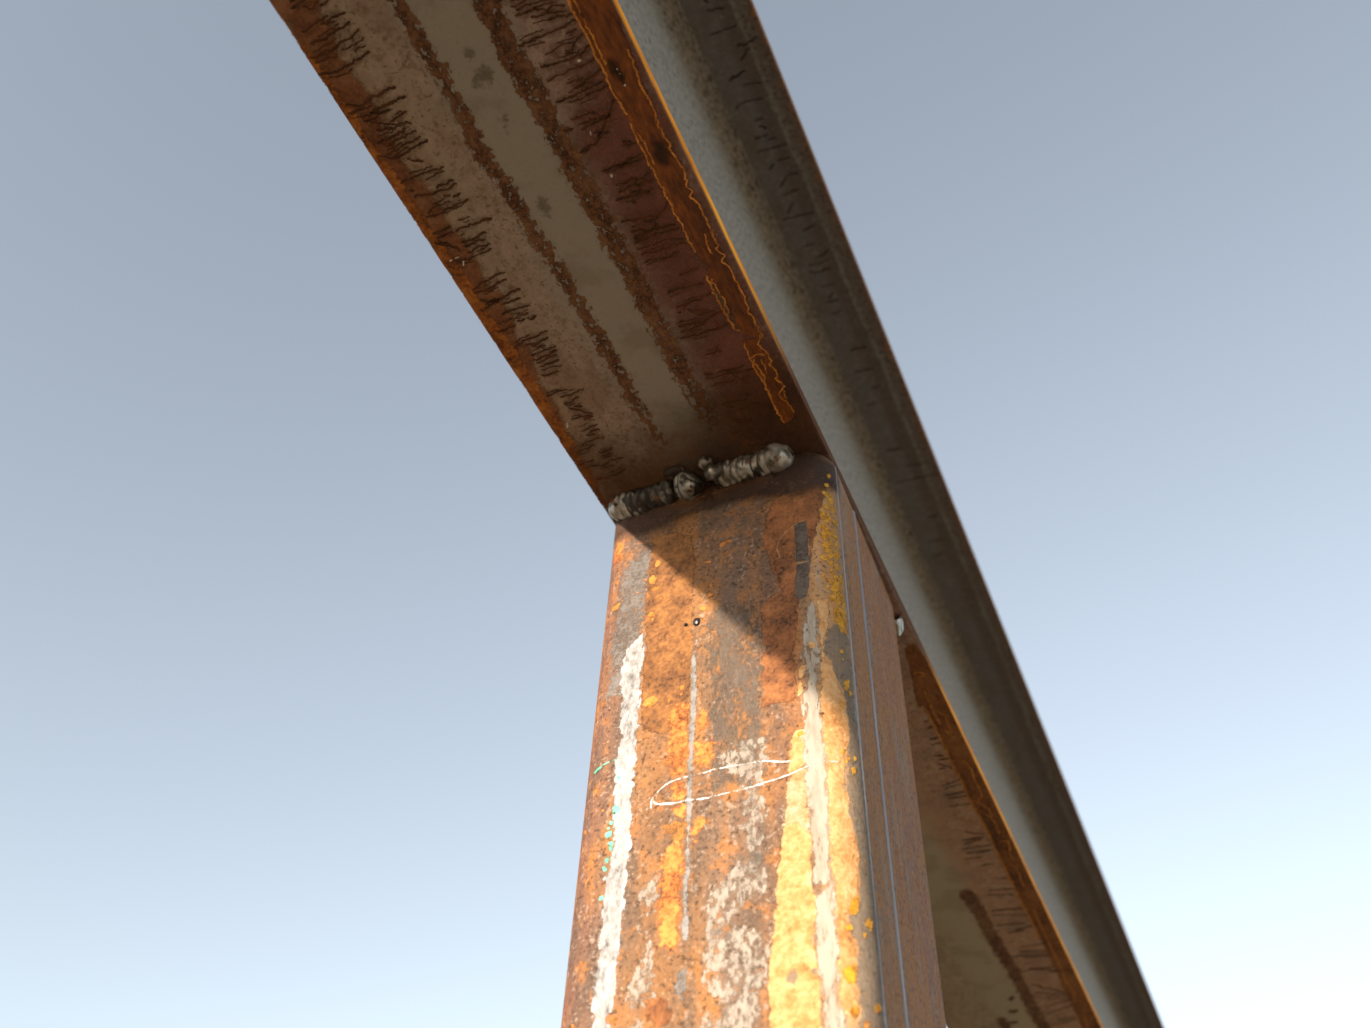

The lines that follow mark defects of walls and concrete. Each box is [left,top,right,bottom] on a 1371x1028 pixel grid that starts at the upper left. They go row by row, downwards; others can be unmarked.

corrosion [269,0,605,504]
corrosion [387,0,668,450]
corrosion [473,0,813,425]
corrosion [614,542,624,564]
corrosion [643,997,672,1028]
corrosion [636,532,717,948]
peeling [794,522,811,599]
corrosion [760,474,882,1028]
corrosion [905,644,1100,1028]